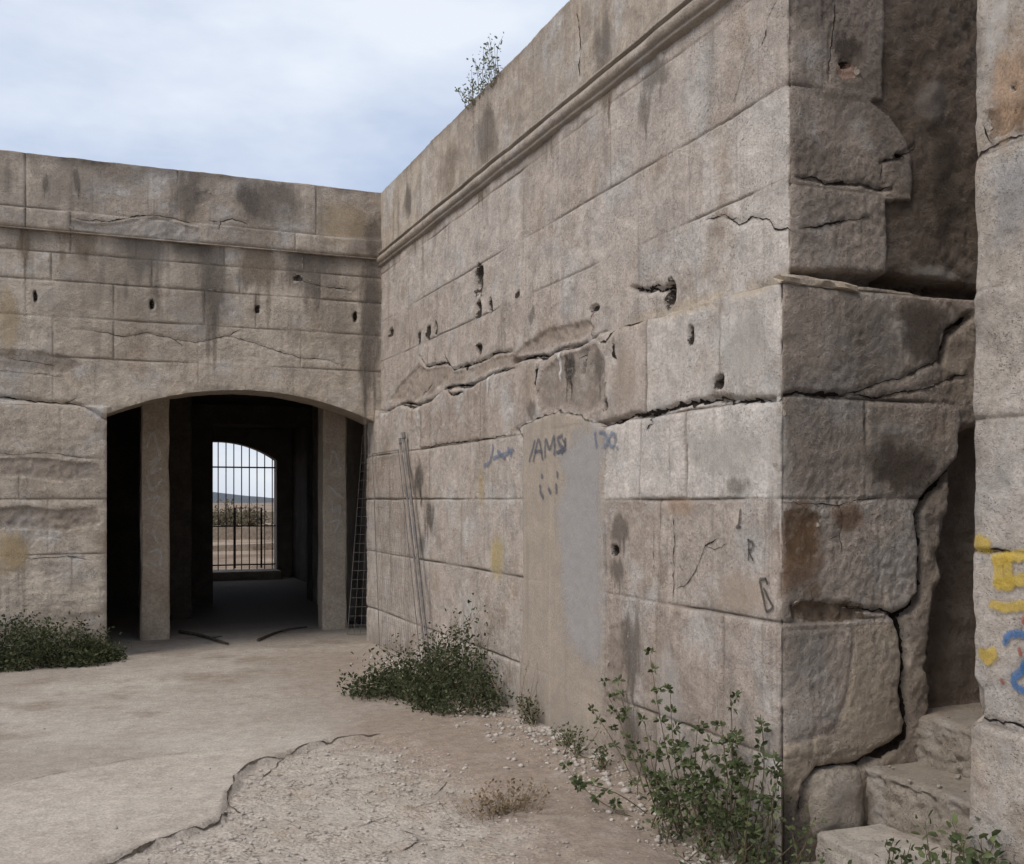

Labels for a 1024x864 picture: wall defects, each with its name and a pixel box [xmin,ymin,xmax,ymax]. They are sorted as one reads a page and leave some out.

spalling [837,63,861,80]
rust [993,53,1024,137]
crack [798,145,916,191]
crack [70,215,246,226]
crack [706,214,868,232]
crack [389,311,642,412]
crack [423,317,967,448]
damp [611,516,627,577]
crack [653,520,728,609]
rust [782,503,819,588]
crack [791,469,947,809]